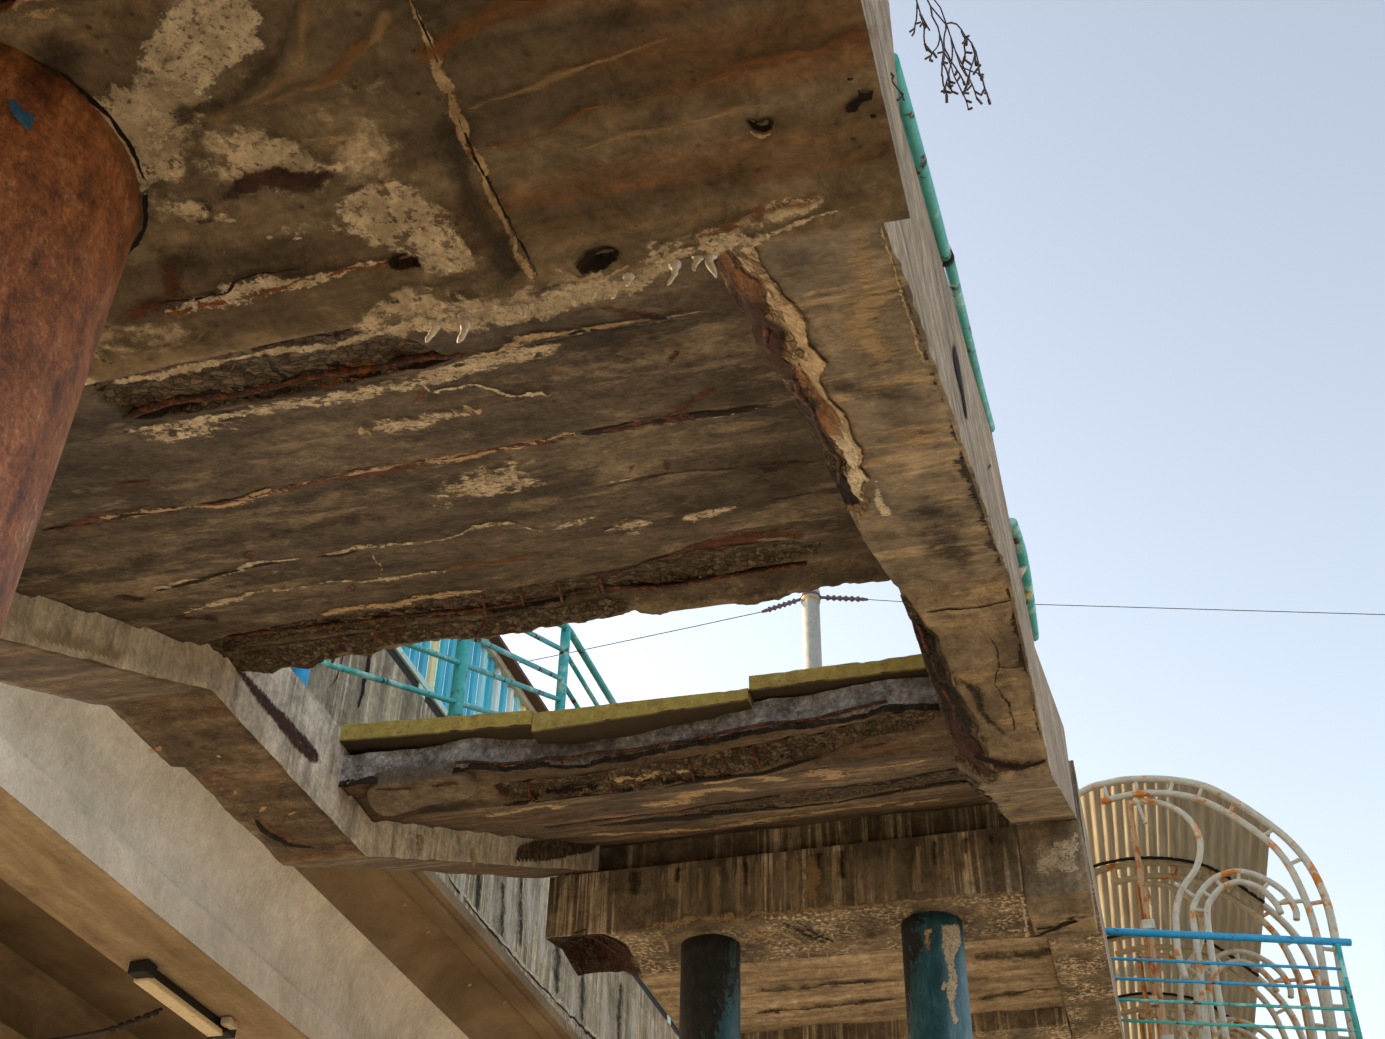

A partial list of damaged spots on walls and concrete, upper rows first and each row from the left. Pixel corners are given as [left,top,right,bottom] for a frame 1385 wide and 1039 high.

leakage [92,0,389,188]
crack [409,0,538,283]
spalling [569,248,630,282]
spalling [90,321,463,421]
spalling [713,246,871,519]
spalling [338,776,378,788]
spalling [204,528,821,763]
spalling [452,595,1003,863]
crack [926,600,1023,730]
peeling [924,924,961,1024]